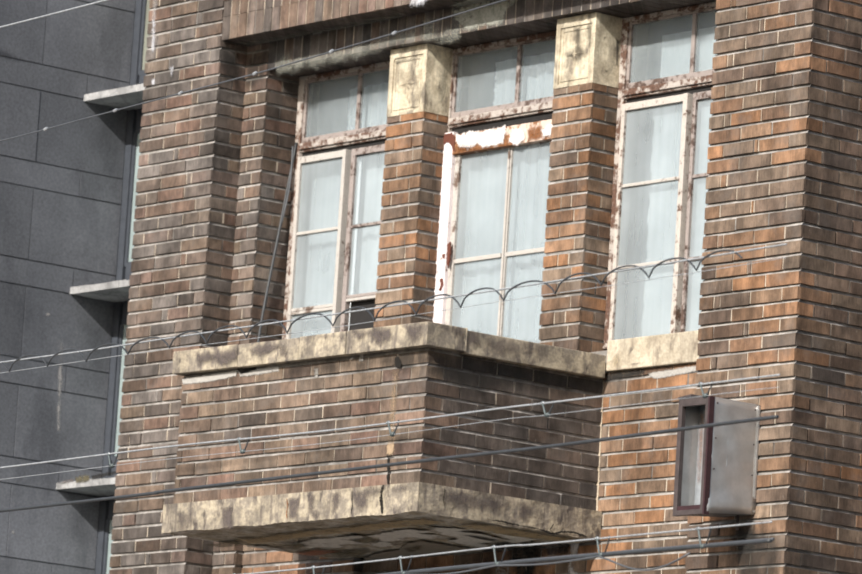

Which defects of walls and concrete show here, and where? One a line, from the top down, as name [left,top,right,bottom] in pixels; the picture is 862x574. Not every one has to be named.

peeling [443,124,553,151]
peeling [442,242,452,268]
water stain [197,349,236,365]
water stain [251,344,284,354]
water stain [354,329,390,343]
water stain [406,325,421,338]
water stain [438,356,592,391]
crack [379,455,393,514]
water stain [737,527,753,551]
water stain [510,543,579,574]